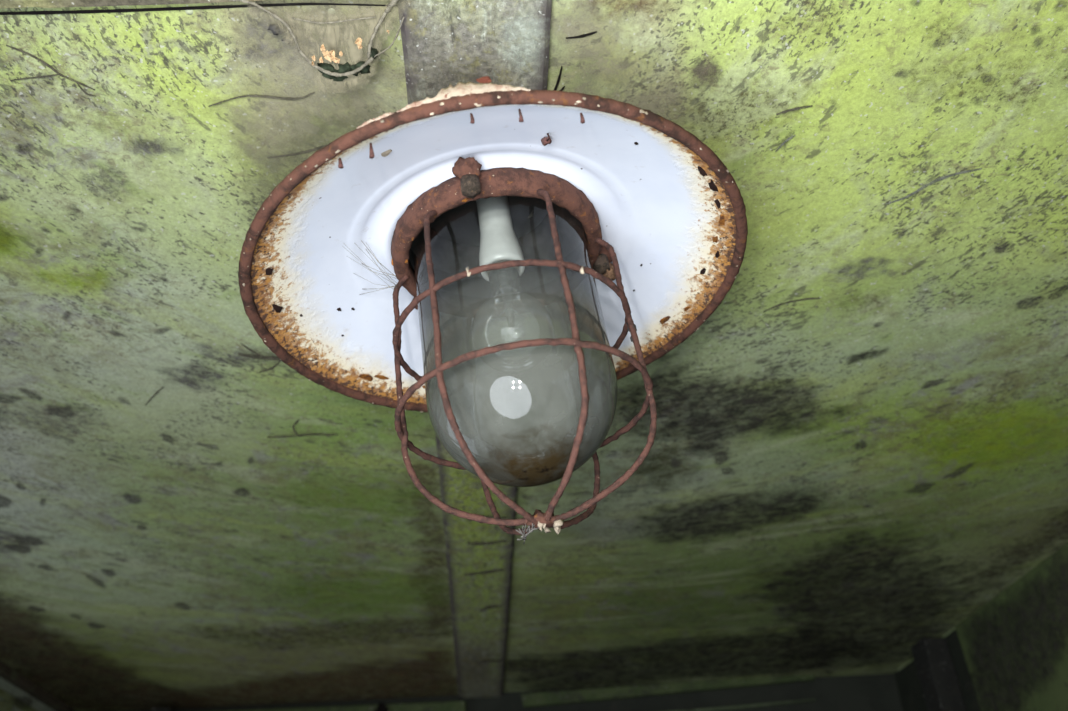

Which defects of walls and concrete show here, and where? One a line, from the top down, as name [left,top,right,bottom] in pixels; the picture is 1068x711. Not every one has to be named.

damp [848,350,885,365]
damp [616,367,815,486]
damp [643,490,825,542]
damp [0,600,458,711]
damp [505,511,1068,691]